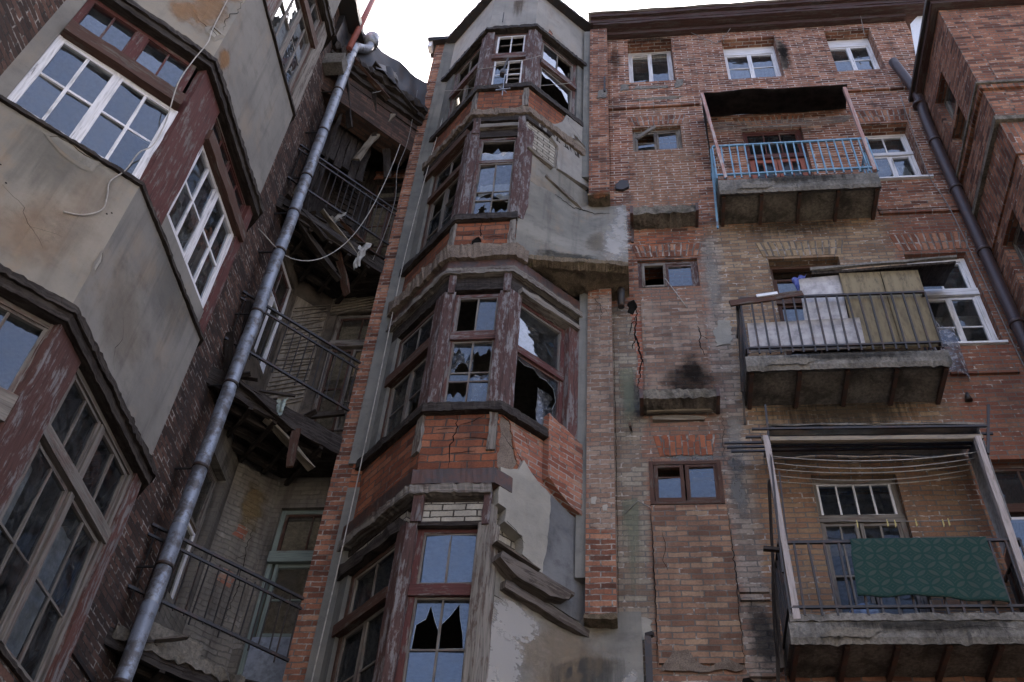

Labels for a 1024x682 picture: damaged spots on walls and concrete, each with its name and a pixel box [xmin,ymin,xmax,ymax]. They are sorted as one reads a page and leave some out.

peeling [604,207,630,259]
crack [438,415,536,477]
spalling [495,414,519,469]
crack [588,295,644,612]